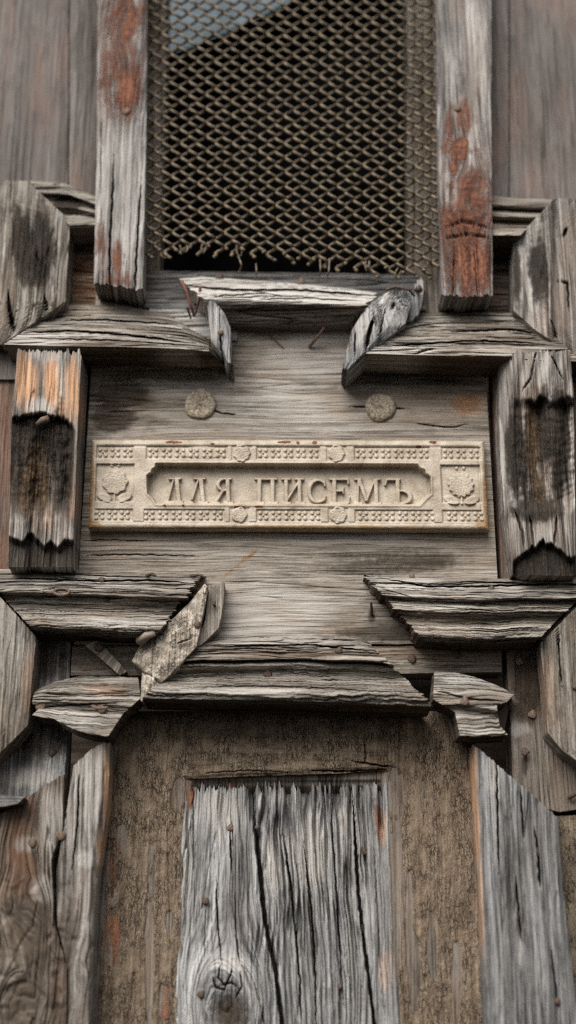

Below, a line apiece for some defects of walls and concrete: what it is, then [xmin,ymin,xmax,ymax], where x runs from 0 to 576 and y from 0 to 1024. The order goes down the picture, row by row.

damp [12,197,80,286]
crack [108,162,141,284]
crack [72,781,80,867]
crack [207,744,386,1024]